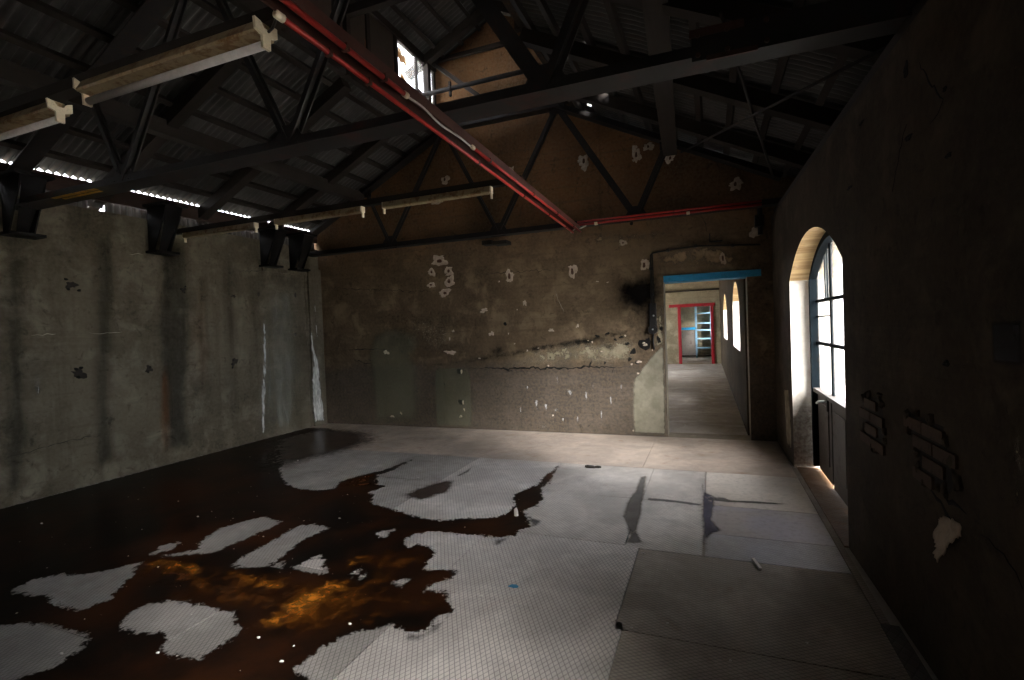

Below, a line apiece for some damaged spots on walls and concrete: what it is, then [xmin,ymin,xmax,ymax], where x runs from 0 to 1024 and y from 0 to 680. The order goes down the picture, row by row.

spalling [427,255,455,298]
crack [467,361,636,372]
peeling [527,312,665,434]
damp [265,326,372,468]
damp [408,470,469,499]
peeling [933,516,962,563]